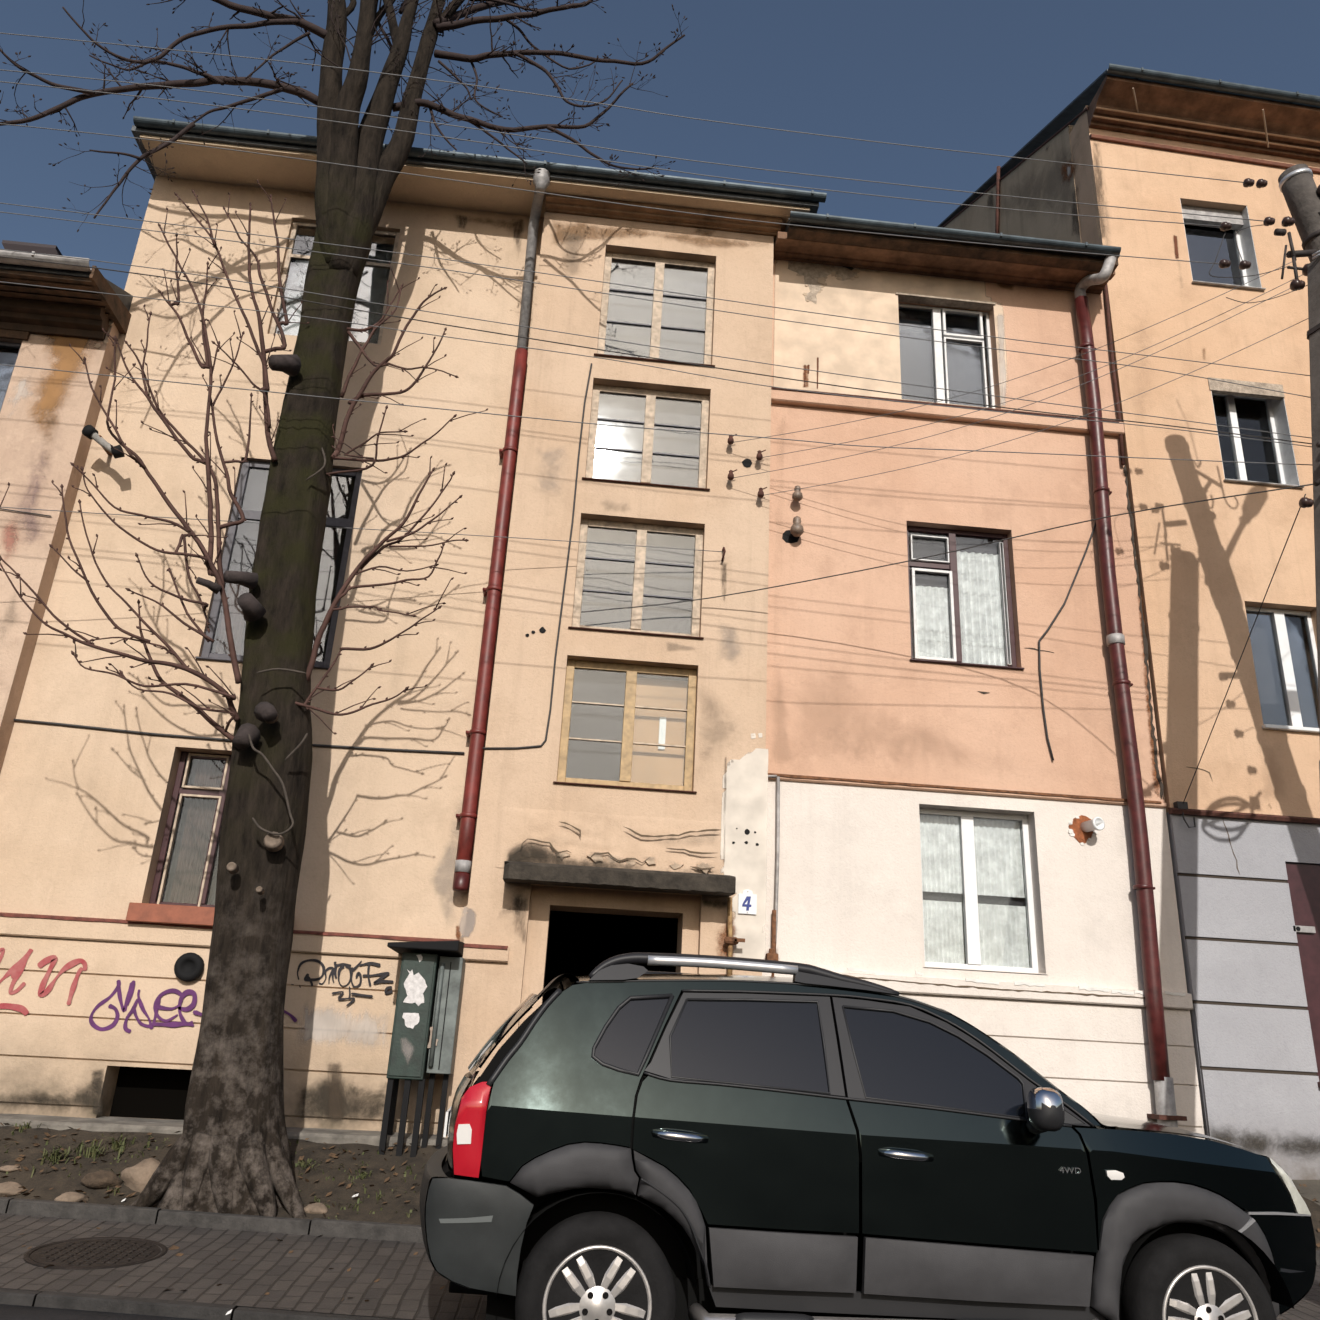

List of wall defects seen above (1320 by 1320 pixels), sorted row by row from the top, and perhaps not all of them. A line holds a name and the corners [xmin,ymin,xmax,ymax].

damp [556,224,644,240]
damp [33,335,88,423]
damp [4,487,37,551]
rust [719,926,735,956]
damp [301,1065,384,1119]